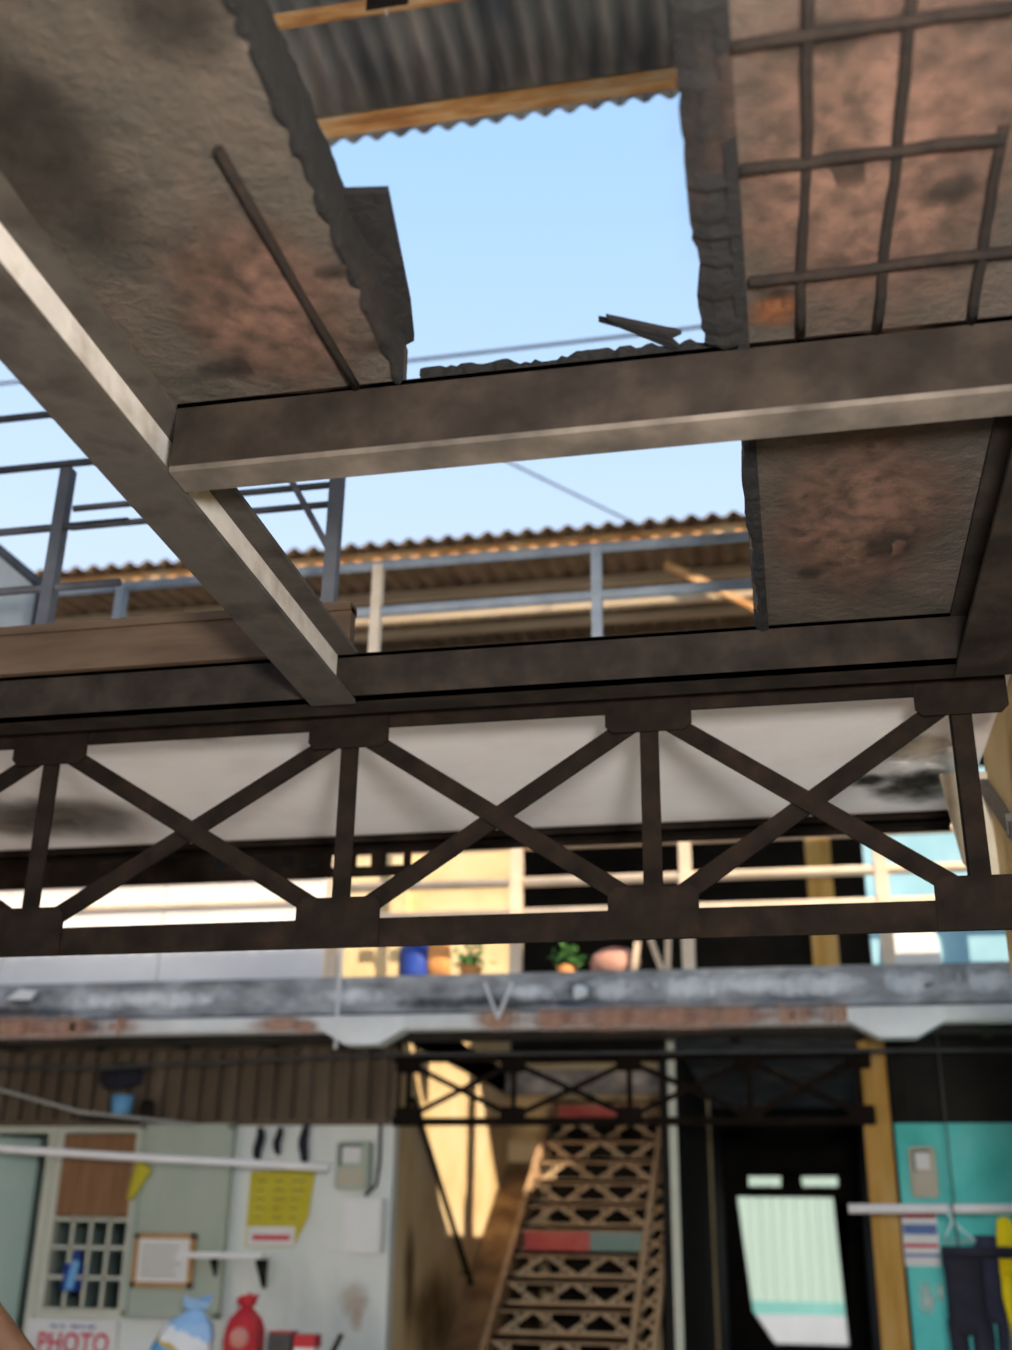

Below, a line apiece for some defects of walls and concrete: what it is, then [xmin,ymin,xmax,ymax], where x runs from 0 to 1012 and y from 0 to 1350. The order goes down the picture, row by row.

water stain [853,770,943,799]
water stain [72,991,213,1008]
water stain [310,987,384,1004]
water stain [413,985,552,1008]
water stain [586,972,935,1000]
water stain [957,970,1012,993]
rust [0,1018,128,1037]
rust [262,1018,314,1032]